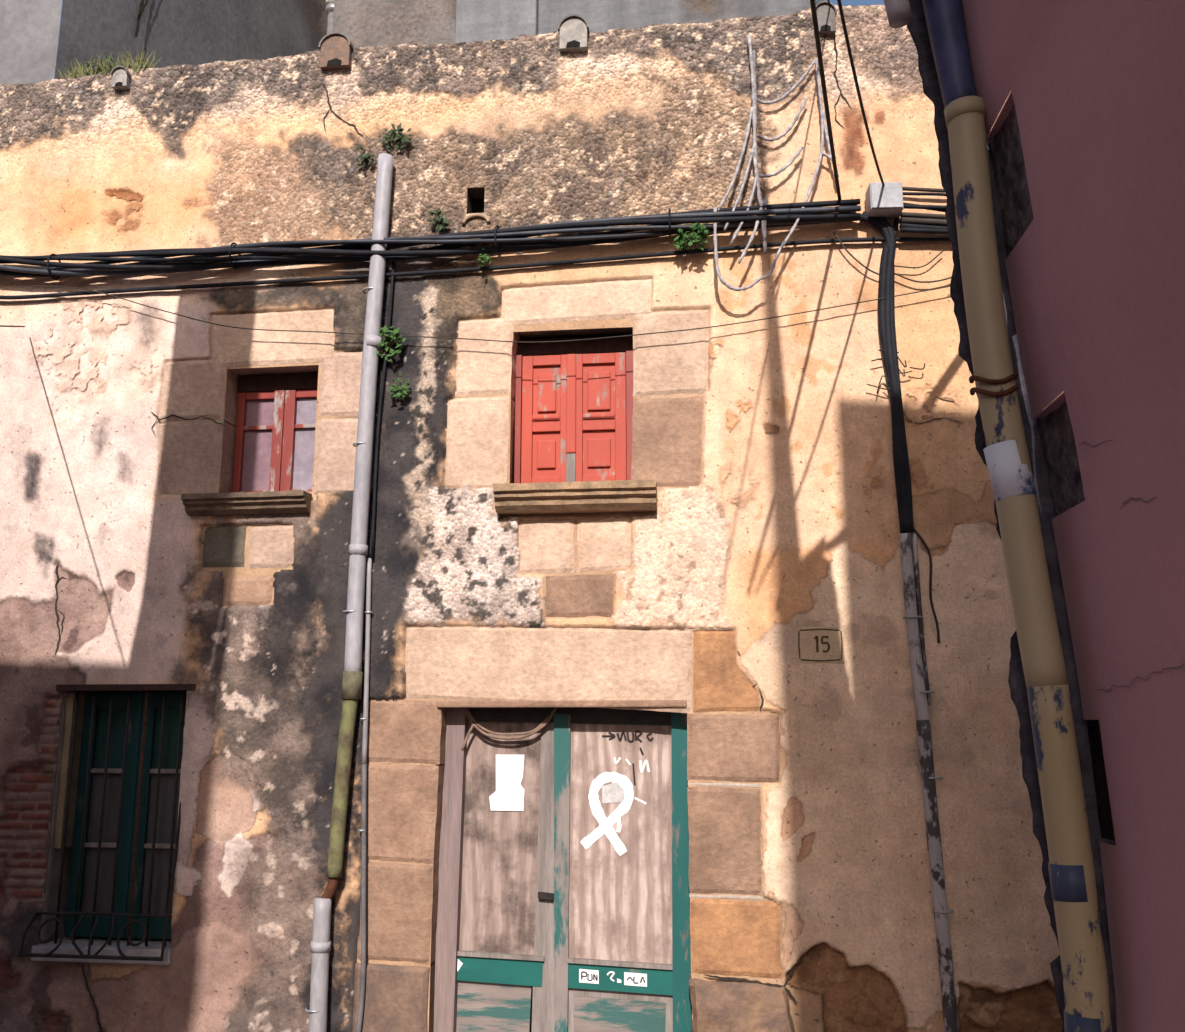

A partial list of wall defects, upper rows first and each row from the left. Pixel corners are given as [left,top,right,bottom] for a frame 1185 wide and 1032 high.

flaking render [104,188,144,230]
crack [151,412,225,434]
flaking render [904,380,961,421]
leakage [24,454,40,499]
leakage [36,539,52,561]
crack [55,565,66,655]
leakage [172,107,683,1032]
flaking render [0,561,135,817]
flaking render [739,459,1063,1032]
flaking render [170,754,282,966]
flaking render [0,795,105,1032]
crack [82,965,103,1032]